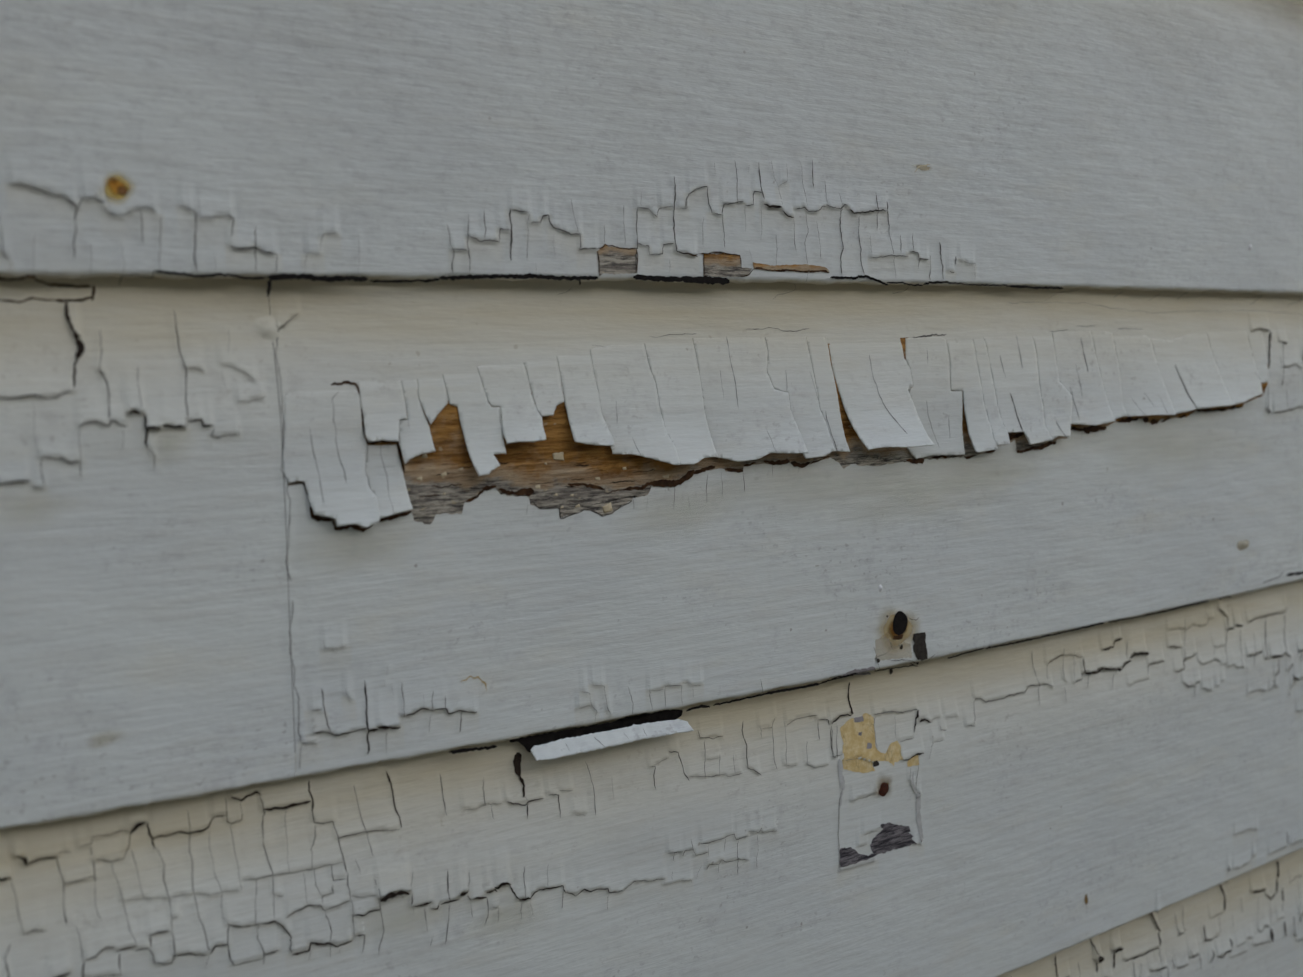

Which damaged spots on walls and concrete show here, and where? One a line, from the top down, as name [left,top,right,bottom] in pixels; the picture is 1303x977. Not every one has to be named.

corrosion [104,176,130,199]
crack [447,161,976,280]
peeling [282,325,1269,532]
crack [0,183,775,949]
corrosion [883,614,912,646]
peeling [509,709,694,761]
peeling [854,716,879,767]
crack [579,638,1164,868]